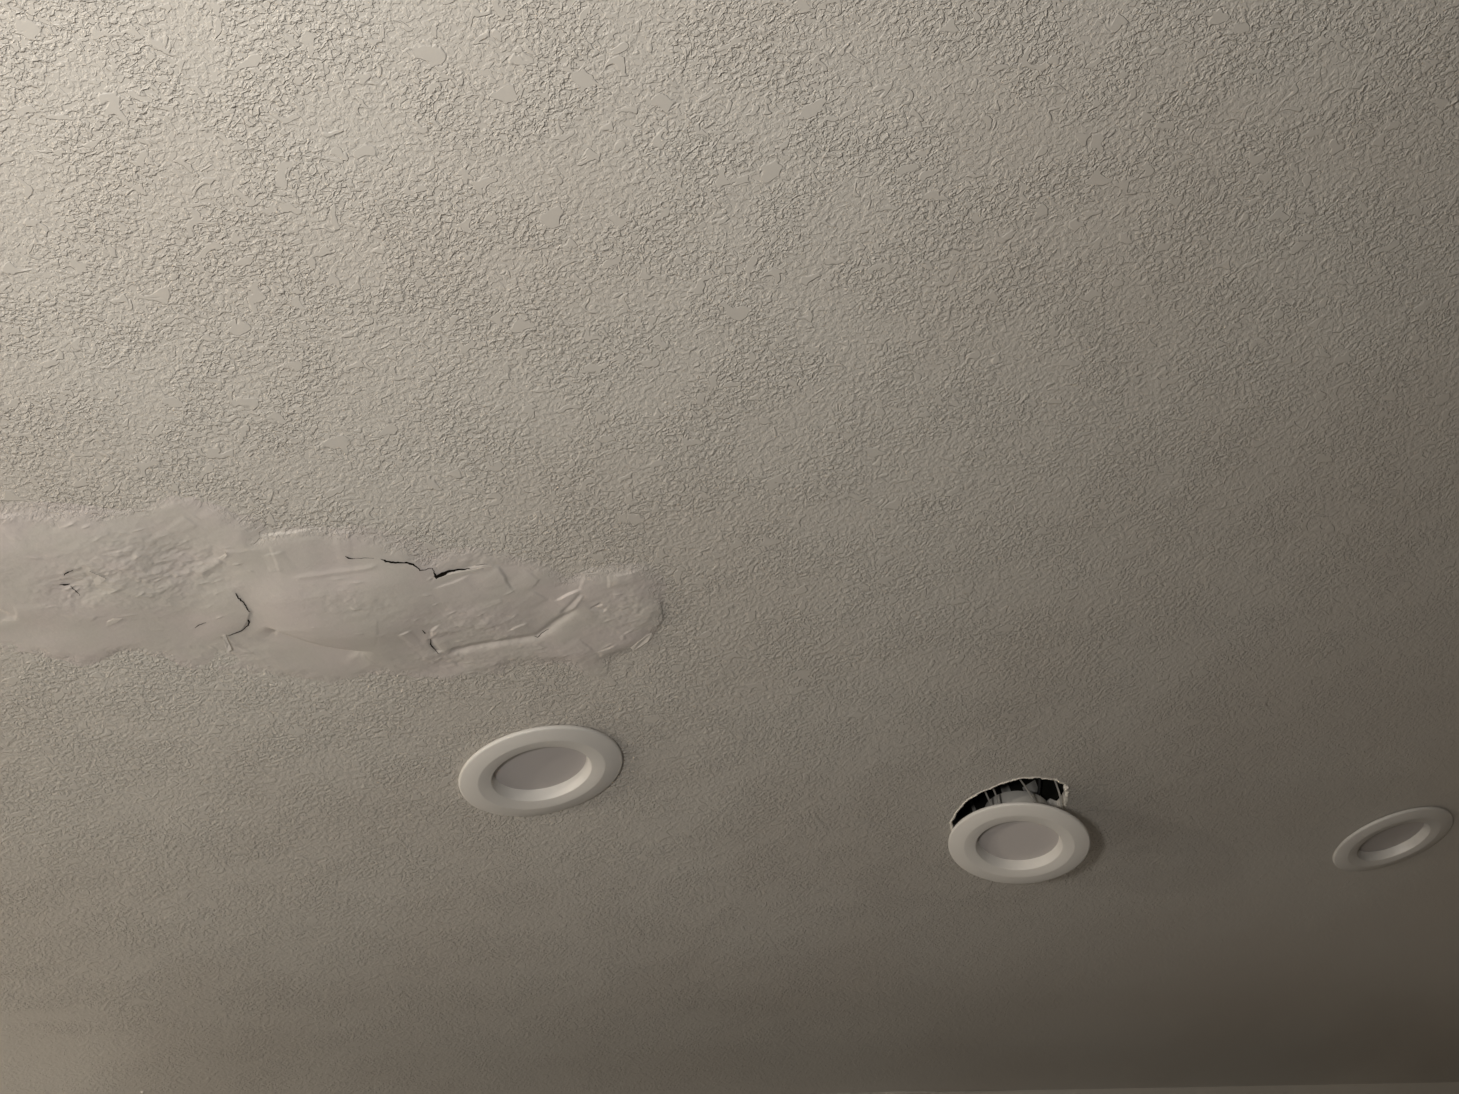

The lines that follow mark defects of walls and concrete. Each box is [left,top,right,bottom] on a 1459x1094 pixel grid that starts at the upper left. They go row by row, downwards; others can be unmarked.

crack [195,593,250,636]
peeling [0,496,667,684]
crack [345,556,484,579]
spalling [949,776,1069,831]